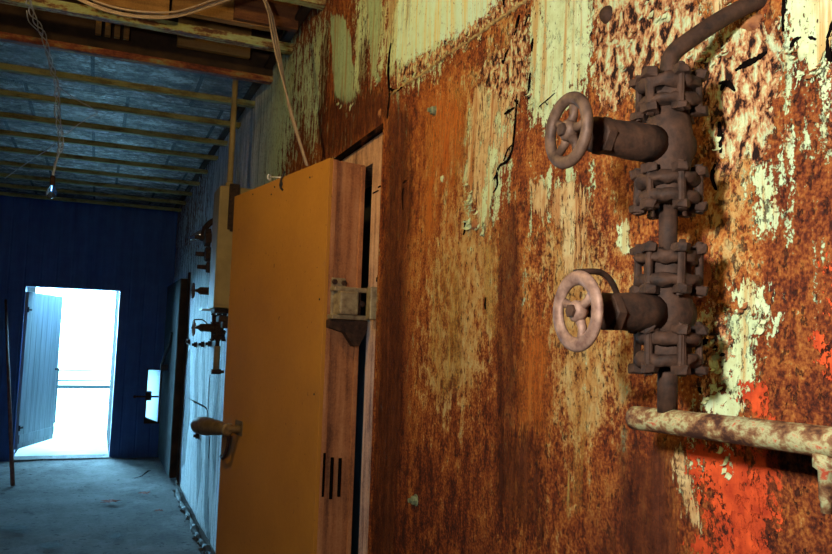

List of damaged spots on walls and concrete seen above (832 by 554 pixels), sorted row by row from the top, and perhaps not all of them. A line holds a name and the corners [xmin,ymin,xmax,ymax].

peeling [330,14,355,111]
corrosion [318,26,389,157]
peeling [392,0,515,82]
peeling [462,61,516,236]
peeling [507,0,595,115]
peeling [705,0,732,14]
peeling [773,0,832,90]
corrosion [797,40,809,61]
corrosion [817,68,832,158]
corrosion [485,208,545,493]
peeling [696,277,785,417]
peeling [670,442,702,535]